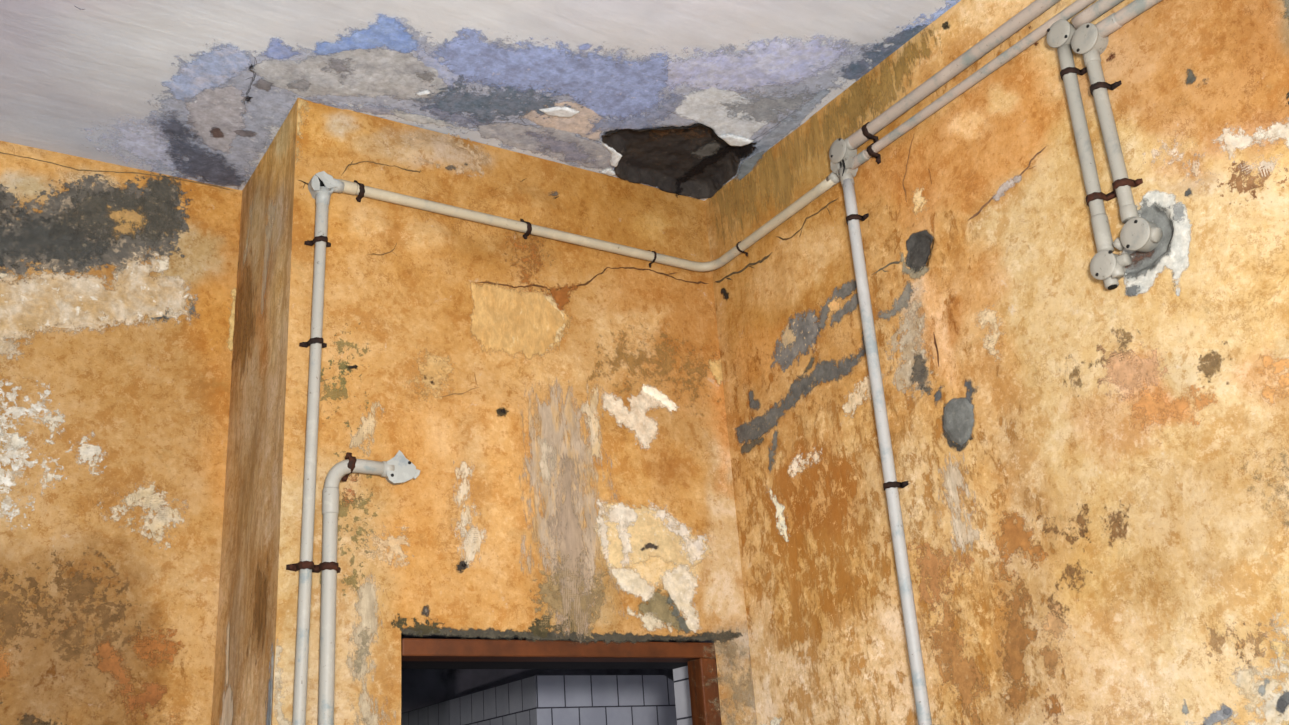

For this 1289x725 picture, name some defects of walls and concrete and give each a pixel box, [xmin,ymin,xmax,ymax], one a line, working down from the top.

peeling [86,14,883,199]
water stain [0,377,107,531]
water stain [0,546,149,678]
water stain [0,112,244,279]
water stain [98,481,187,550]
peeling [470,282,572,359]
water stain [519,324,721,638]
peeling [602,384,678,448]
peeling [594,500,713,634]
crack [479,198,838,293]
peeling [735,279,866,471]
flaking render [1119,118,1289,296]